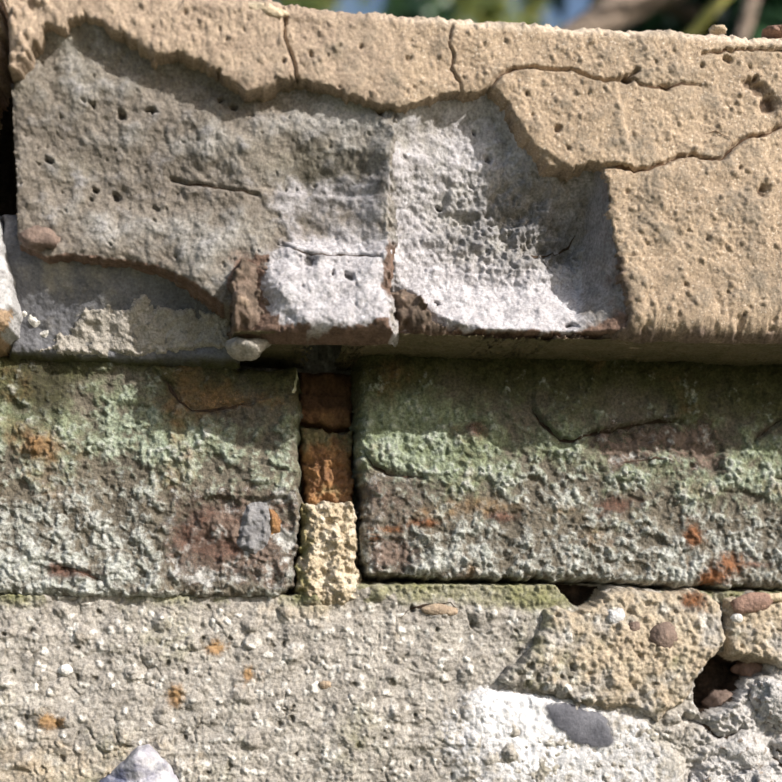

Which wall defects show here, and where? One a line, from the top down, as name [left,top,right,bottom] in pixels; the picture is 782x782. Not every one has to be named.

crack [704,47,782,55]
crack [492,67,699,90]
crack [608,126,782,173]
crack [173,181,258,196]
spalling [0,0,628,347]
crack [532,409,675,464]